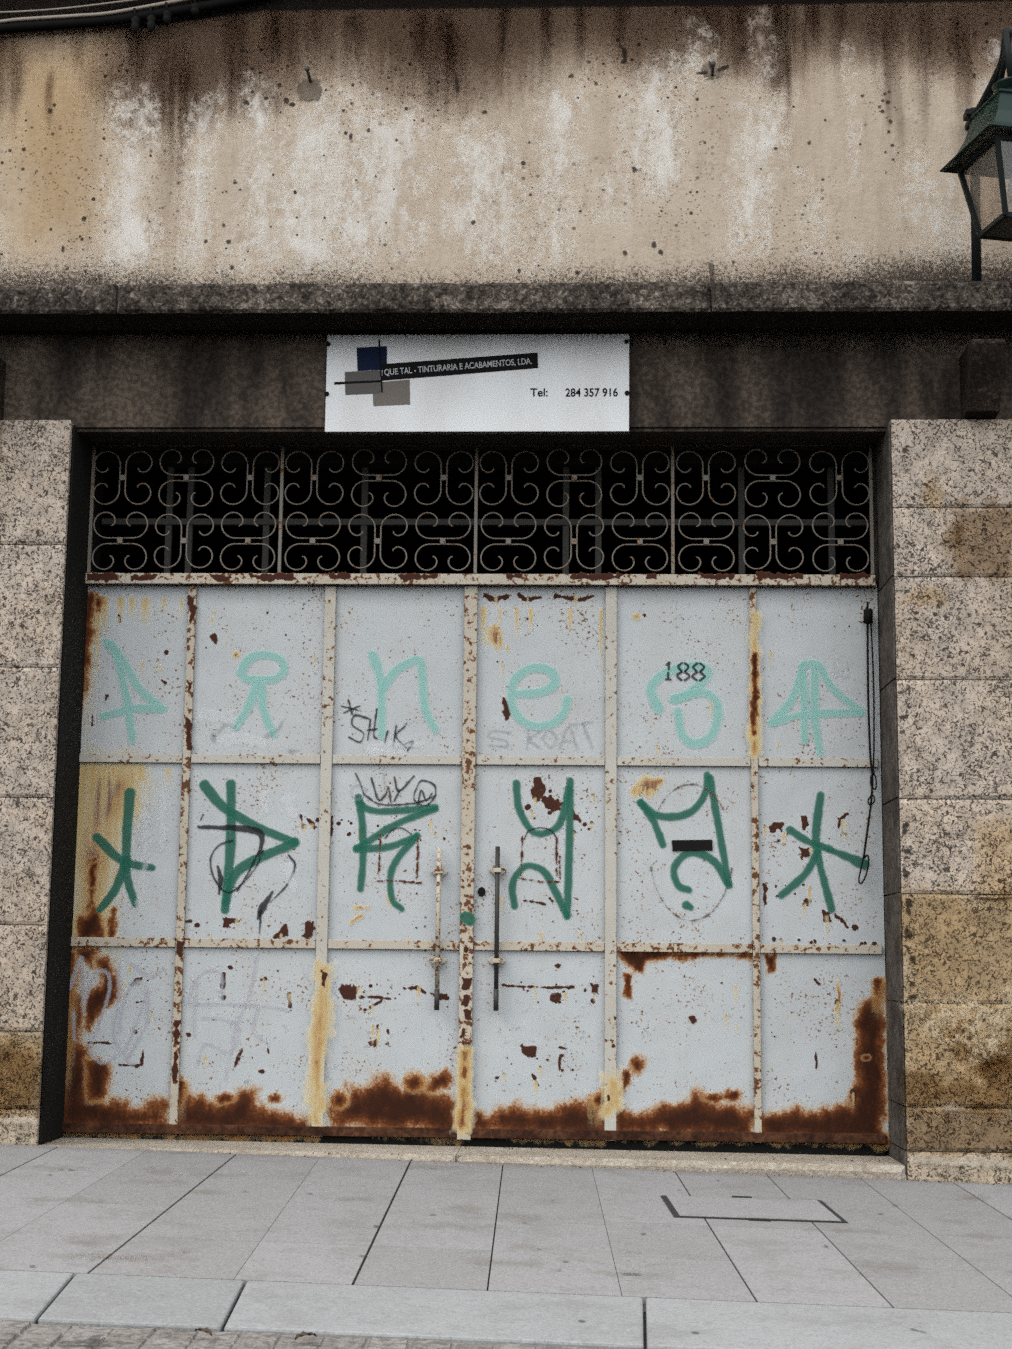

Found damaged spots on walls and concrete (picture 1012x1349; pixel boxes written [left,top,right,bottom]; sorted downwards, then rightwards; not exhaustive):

water stain [0,229,1012,286]
rust [328,572,351,580]
rust [395,573,438,582]
rust [570,572,622,581]
rust [698,572,735,580]
rust [756,571,803,581]
rust [839,572,870,581]
rust [746,613,762,757]
rust [185,717,193,750]
rust [64,762,889,1149]